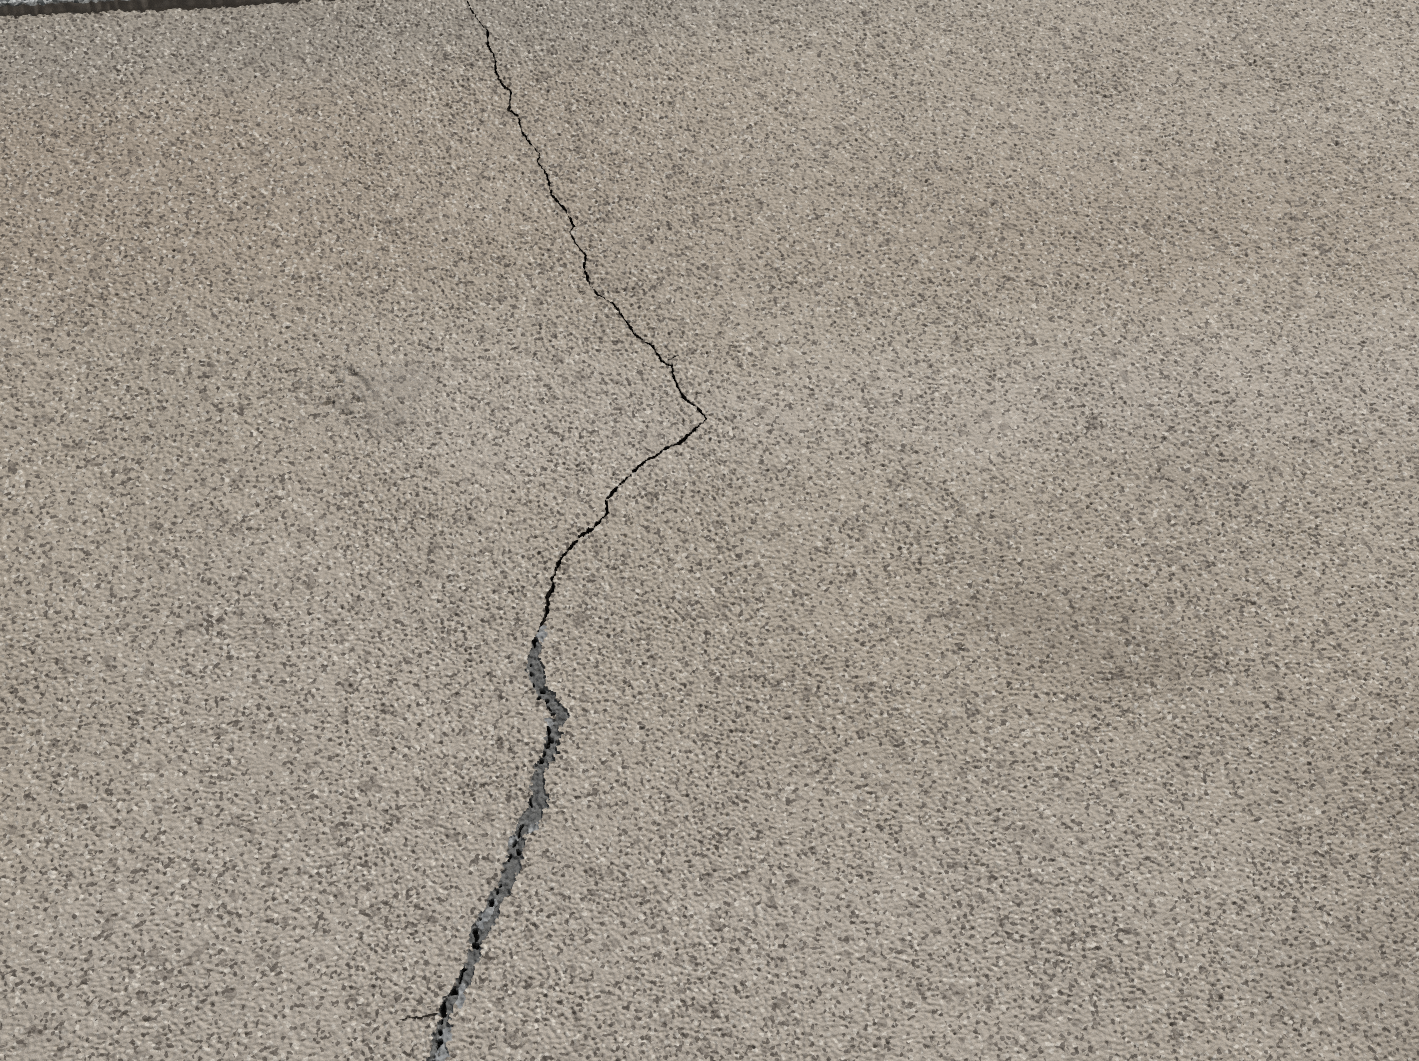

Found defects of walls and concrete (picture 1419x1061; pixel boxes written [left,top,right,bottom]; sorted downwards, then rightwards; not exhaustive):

crack [399,1,707,1061]